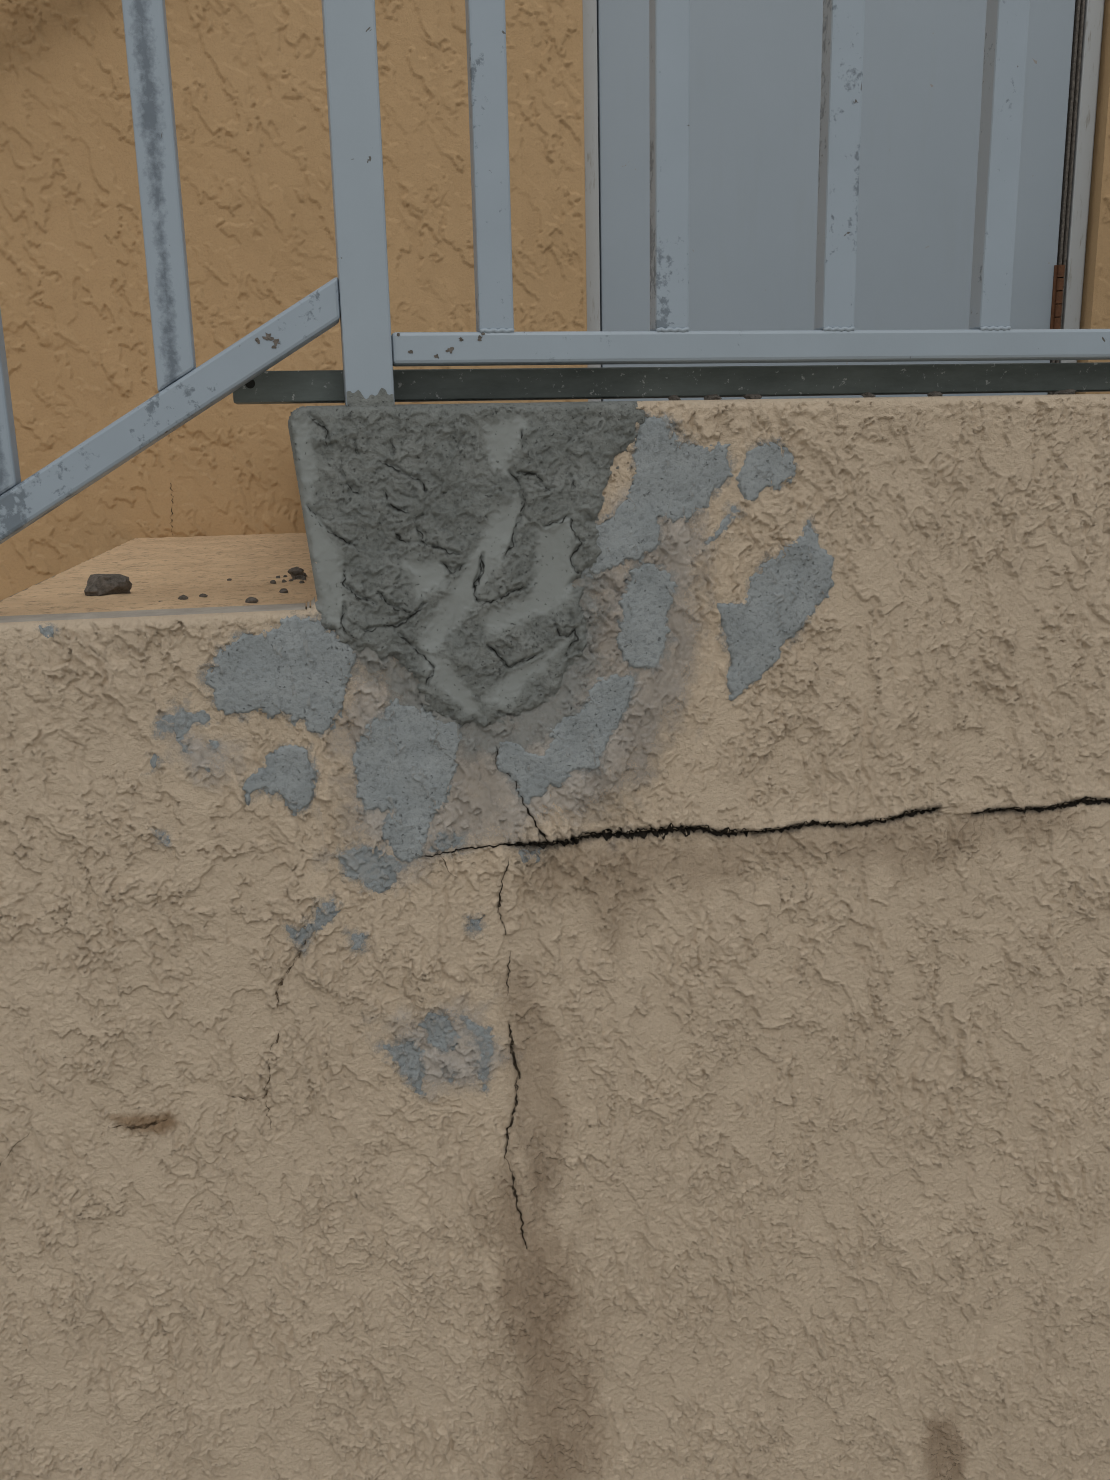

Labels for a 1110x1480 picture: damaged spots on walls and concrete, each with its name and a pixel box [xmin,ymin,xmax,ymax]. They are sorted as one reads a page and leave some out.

peeling [155,708,219,754]
peeling [338,846,407,894]
crack [425,749,1110,1249]